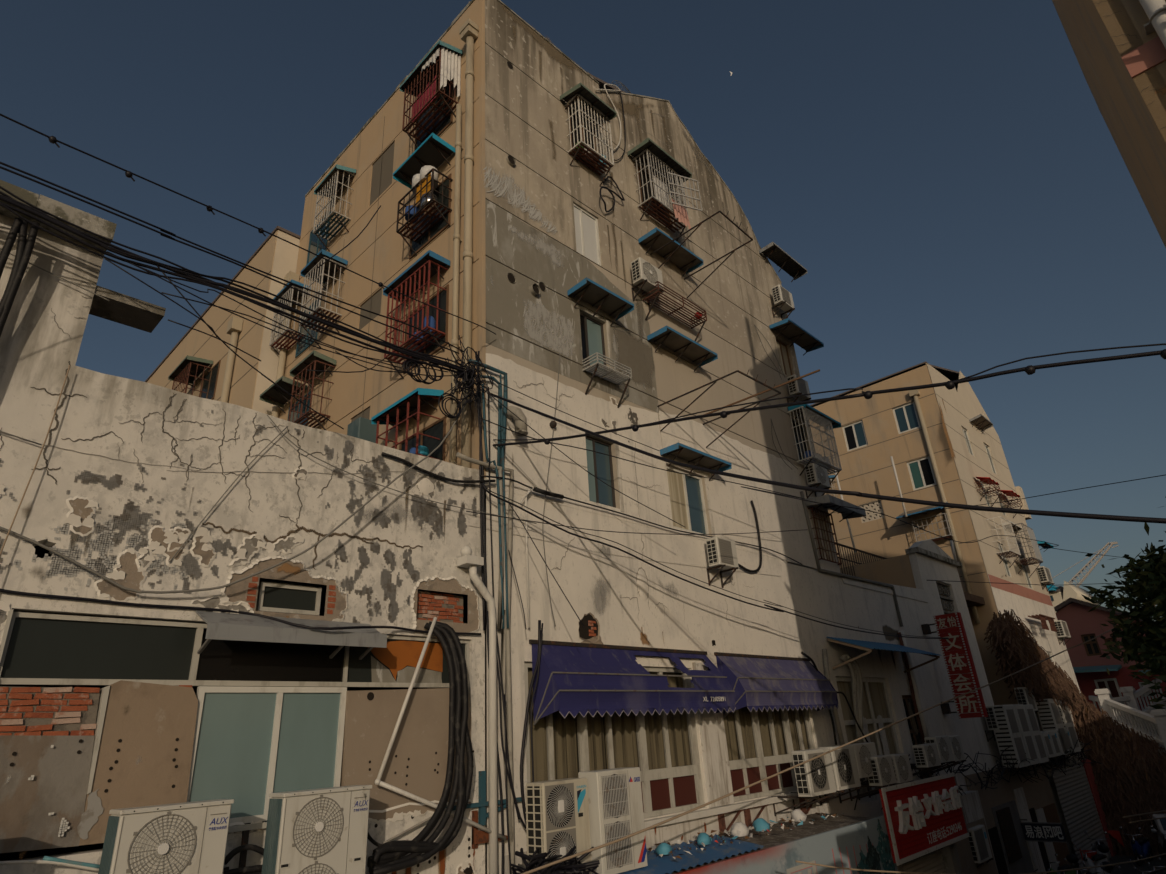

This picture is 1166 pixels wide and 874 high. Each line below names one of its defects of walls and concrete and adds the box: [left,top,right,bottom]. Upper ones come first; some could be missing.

damp [503,6,589,90]
damp [608,101,668,148]
damp [483,166,561,266]
damp [607,199,625,280]
damp [613,293,654,387]
crack [0,281,473,570]
peeling [0,431,481,636]